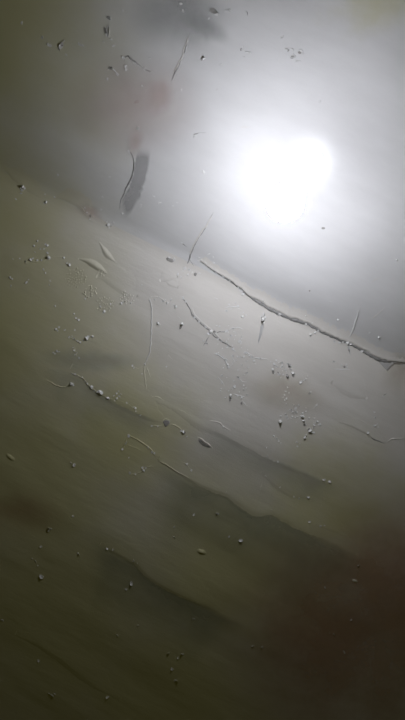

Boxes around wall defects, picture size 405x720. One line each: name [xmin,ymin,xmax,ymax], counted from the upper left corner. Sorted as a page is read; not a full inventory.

crack [182,214,405,371]